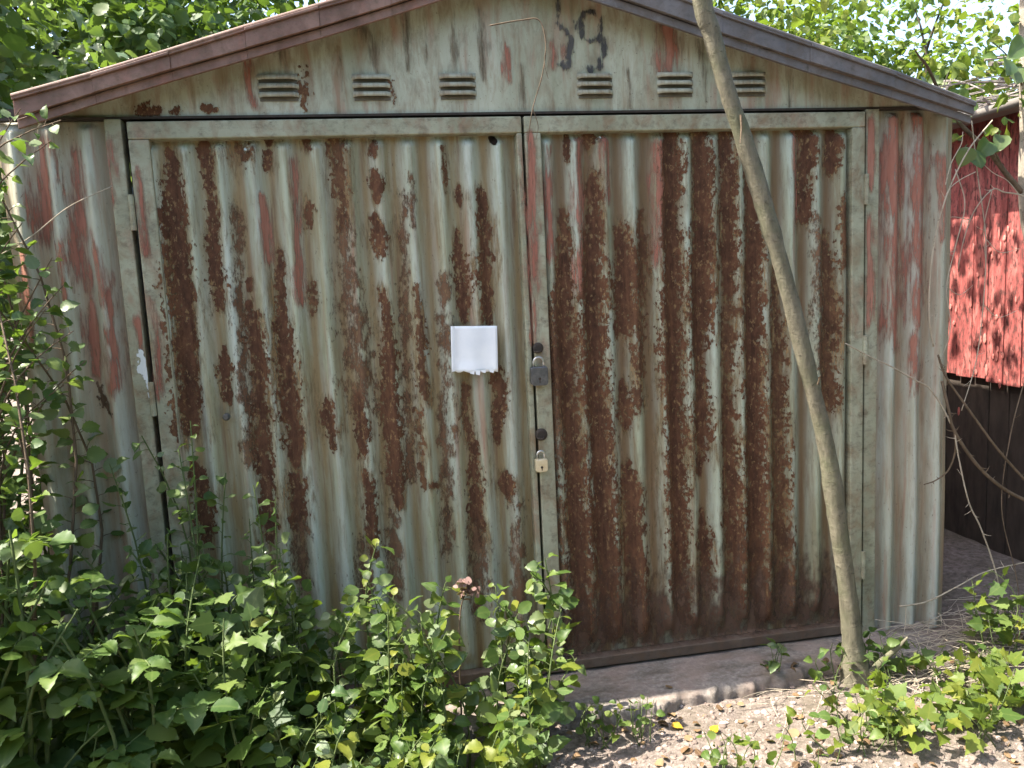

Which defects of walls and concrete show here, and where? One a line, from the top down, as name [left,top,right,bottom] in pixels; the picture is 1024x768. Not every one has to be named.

corrosion [133,100,183,116]
corrosion [200,103,219,114]
corrosion [297,64,314,113]
peeling [19,246,34,343]
peeling [25,136,163,400]
corrosion [152,138,531,628]
corrosion [548,130,847,658]
peeling [866,112,947,394]
peeling [972,225,1017,259]
peeling [973,296,1016,375]